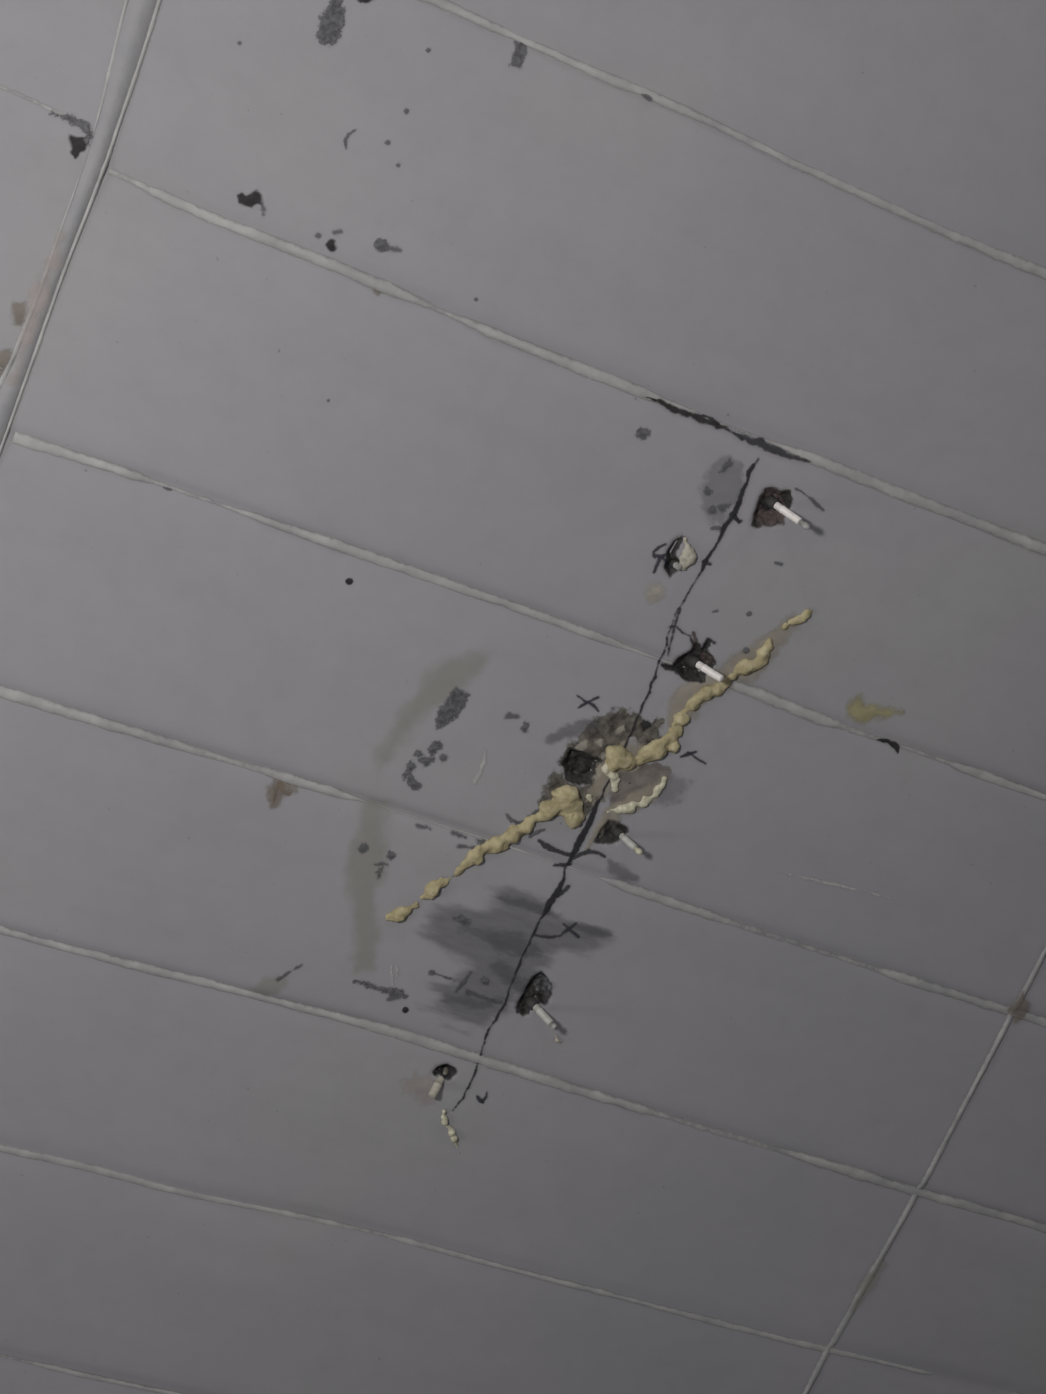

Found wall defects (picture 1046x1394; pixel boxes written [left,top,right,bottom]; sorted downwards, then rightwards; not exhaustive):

crack [624,397,824,748]
leakage [428,970,502,1004]
crack [452,779,610,1111]